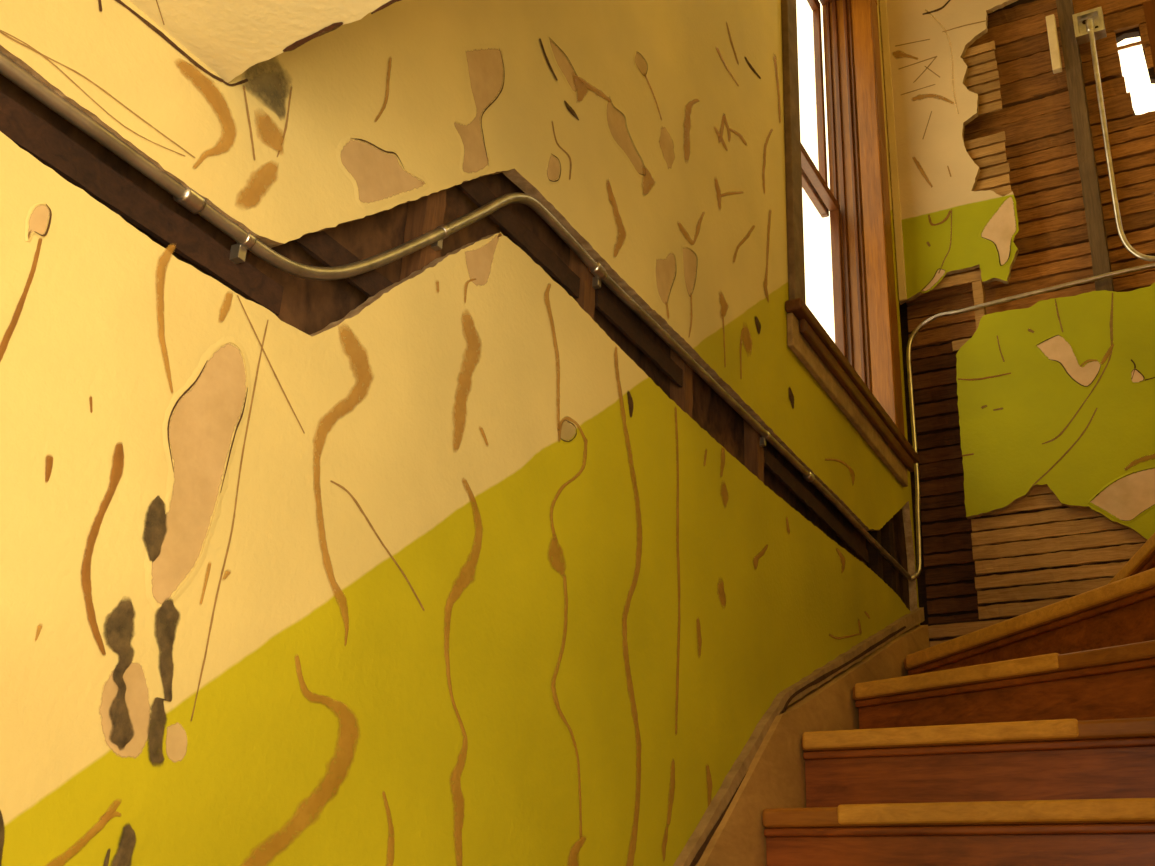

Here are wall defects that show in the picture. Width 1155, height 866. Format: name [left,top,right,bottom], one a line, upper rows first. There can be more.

crack [895,0,986,139]
spalling [0,74,369,335]
peeling [324,133,429,284]
peeling [440,43,570,292]
peeling [978,195,1019,267]
spalling [594,308,670,398]
water stain [81,443,135,749]
water stain [143,496,167,562]
peeling [144,336,251,613]
water stain [200,563,211,604]
water stain [148,599,180,765]
water stain [47,801,136,866]